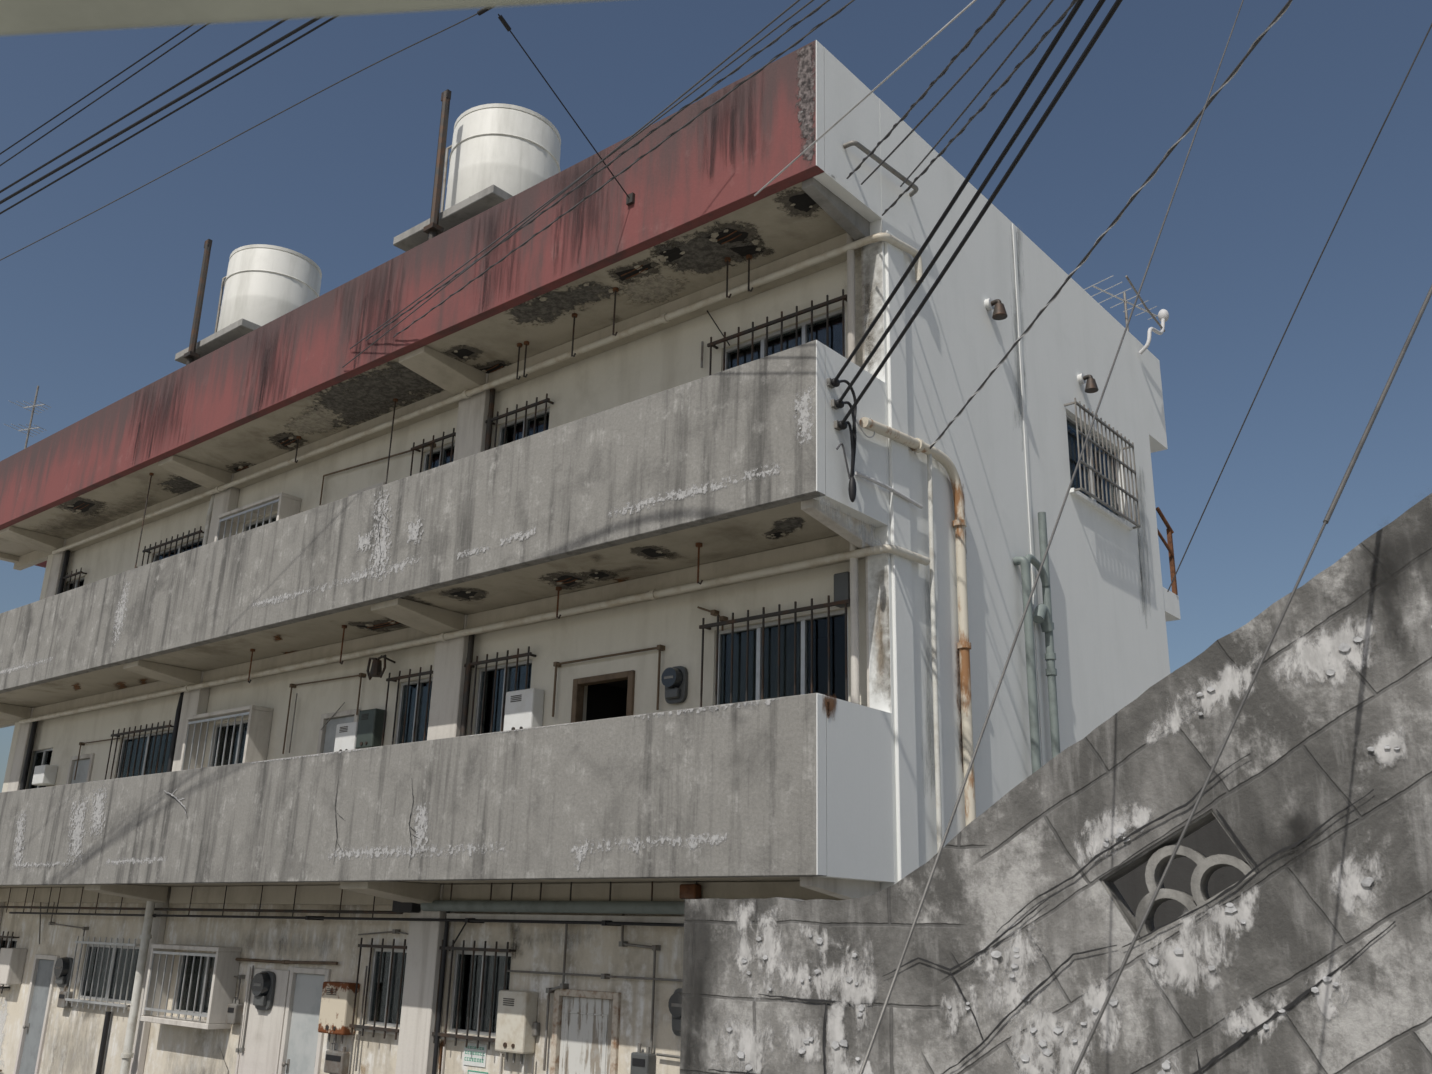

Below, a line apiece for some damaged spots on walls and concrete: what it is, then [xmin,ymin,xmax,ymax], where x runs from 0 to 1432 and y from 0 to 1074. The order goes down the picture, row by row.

peeling [795,44,816,164]
spalling [774,187,821,217]
spalling [506,221,774,327]
peeling [311,362,444,428]
leakage [608,464,779,515]
leakage [457,526,536,559]
leakage [253,557,419,609]
spalling [539,569,617,590]
leakage [328,842,505,860]
leakage [570,833,728,853]
crack [758,754,1396,1074]
crack [708,1066,755,1074]